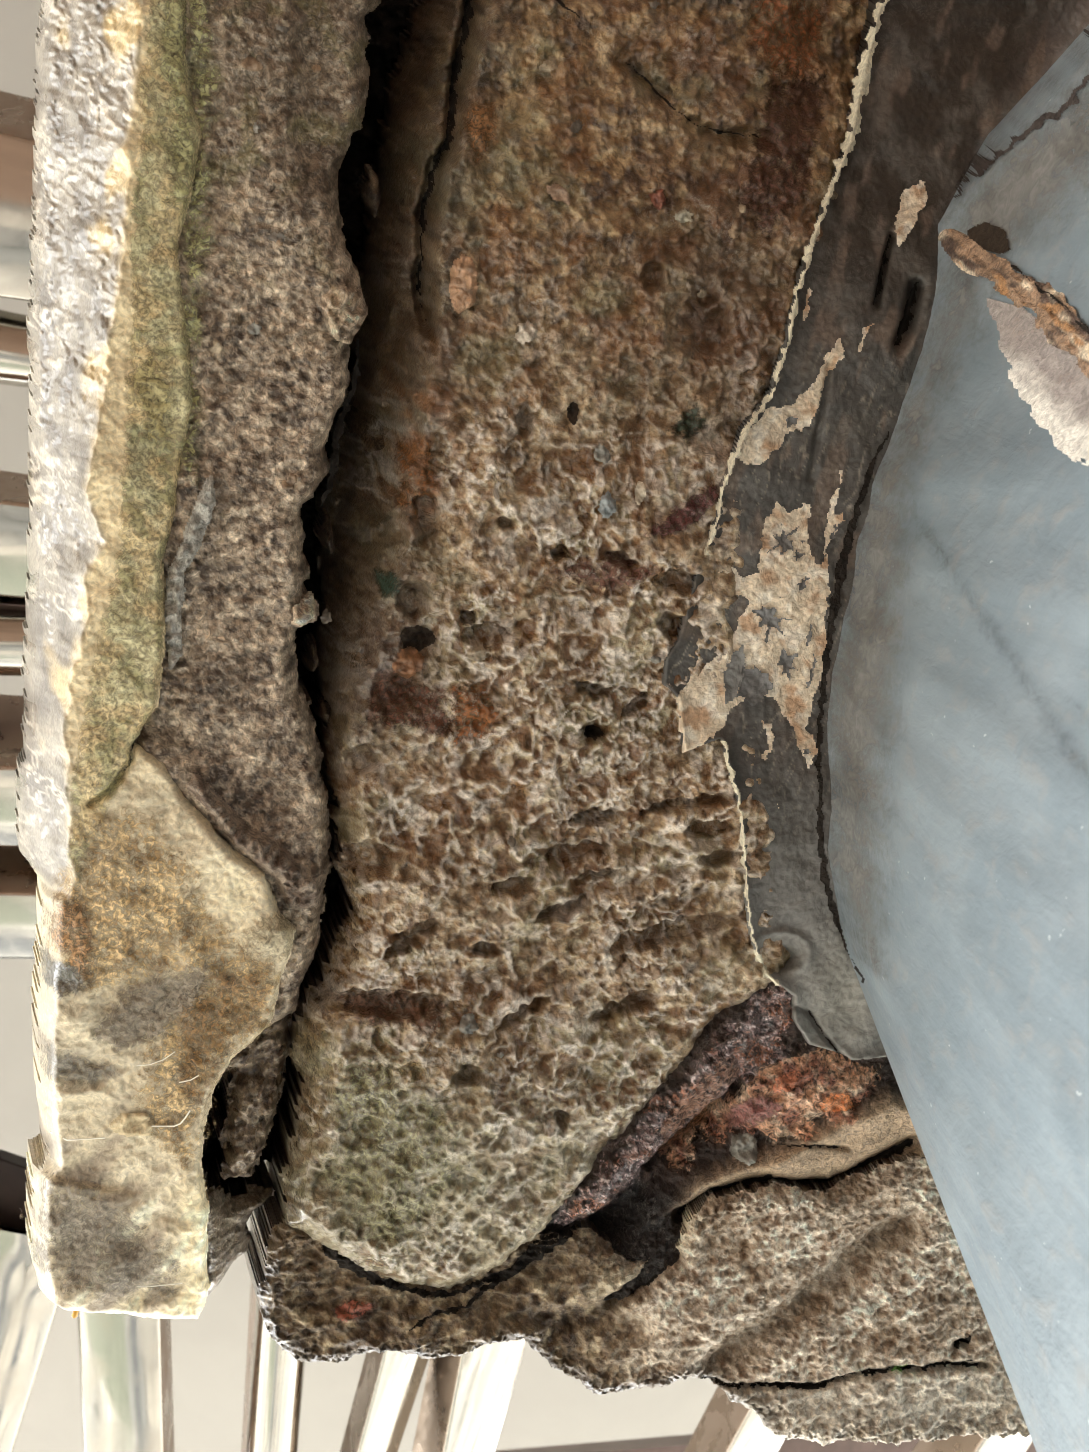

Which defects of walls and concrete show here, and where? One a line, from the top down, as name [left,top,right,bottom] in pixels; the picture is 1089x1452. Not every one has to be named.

crack [338,0,413,266]
crack [416,0,474,321]
peeling [938,222,1089,466]
crack [295,339,361,923]
spalling [135,0,928,1301]
crack [203,1078,222,1158]
crack [260,1056,291,1163]
crack [296,983,306,1016]
corrosion [553,984,881,1228]
crack [321,1203,592,1331]
crack [632,1274,659,1294]
crack [700,1335,979,1390]